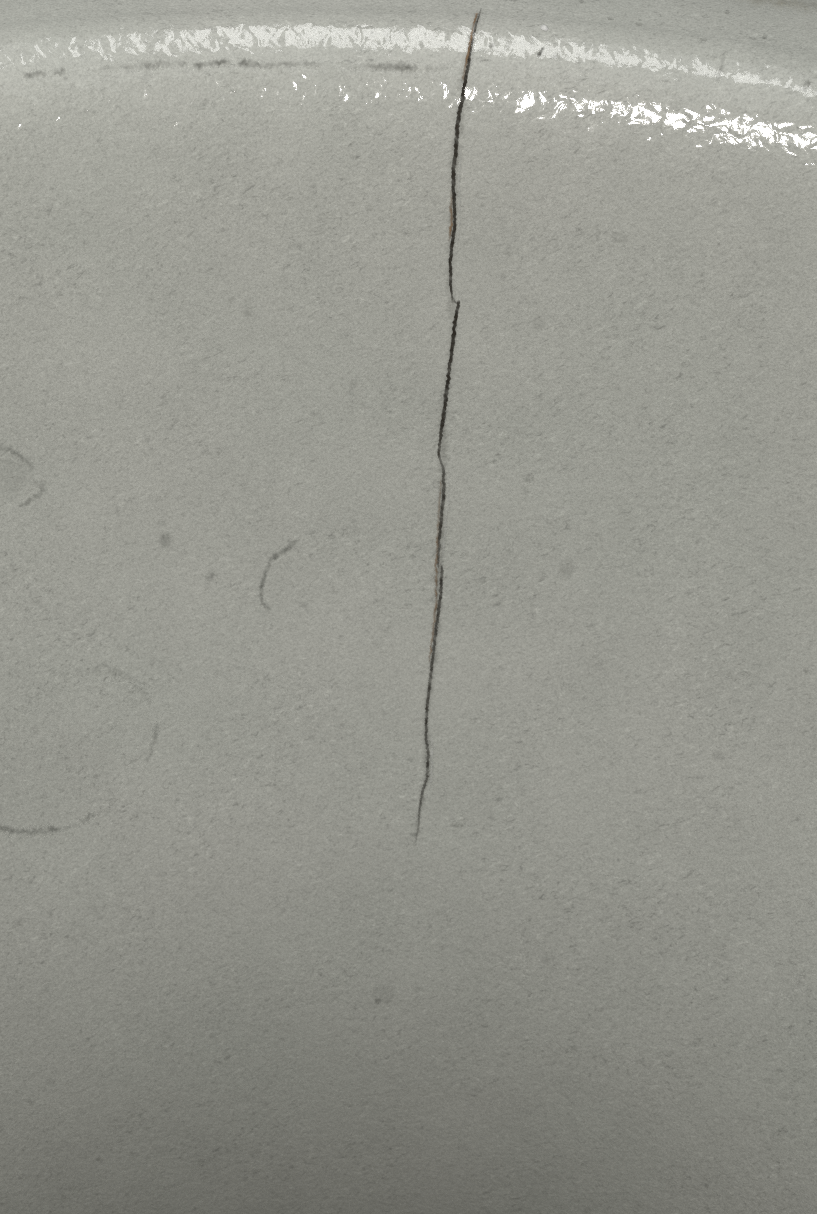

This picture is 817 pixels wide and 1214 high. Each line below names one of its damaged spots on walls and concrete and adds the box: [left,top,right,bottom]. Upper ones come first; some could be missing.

crack [420,13,479,803]